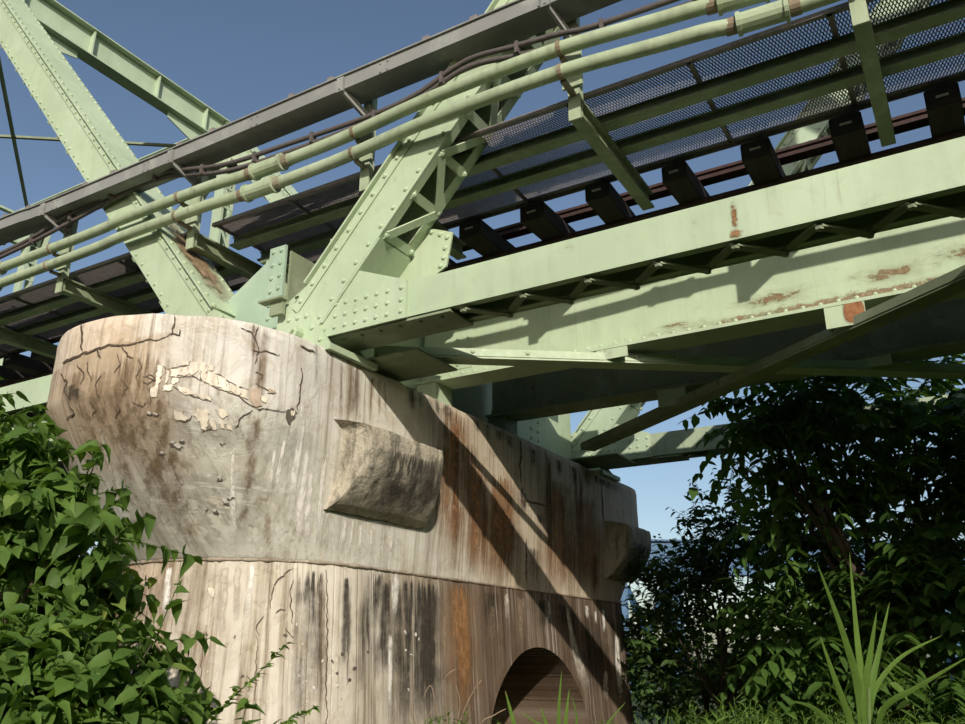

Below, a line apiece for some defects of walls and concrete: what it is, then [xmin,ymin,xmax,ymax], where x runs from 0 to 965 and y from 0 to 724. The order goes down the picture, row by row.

corrosion [730,205,740,237]
corrosion [662,264,941,330]
crack [60,315,315,432]
peeling [150,361,276,431]
corrosion [436,413,516,560]
crack [519,439,551,533]
corrosion [545,462,569,569]
leakage [299,572,322,619]
leakage [362,574,446,703]
leakage [486,593,524,632]
crack [522,539,530,582]